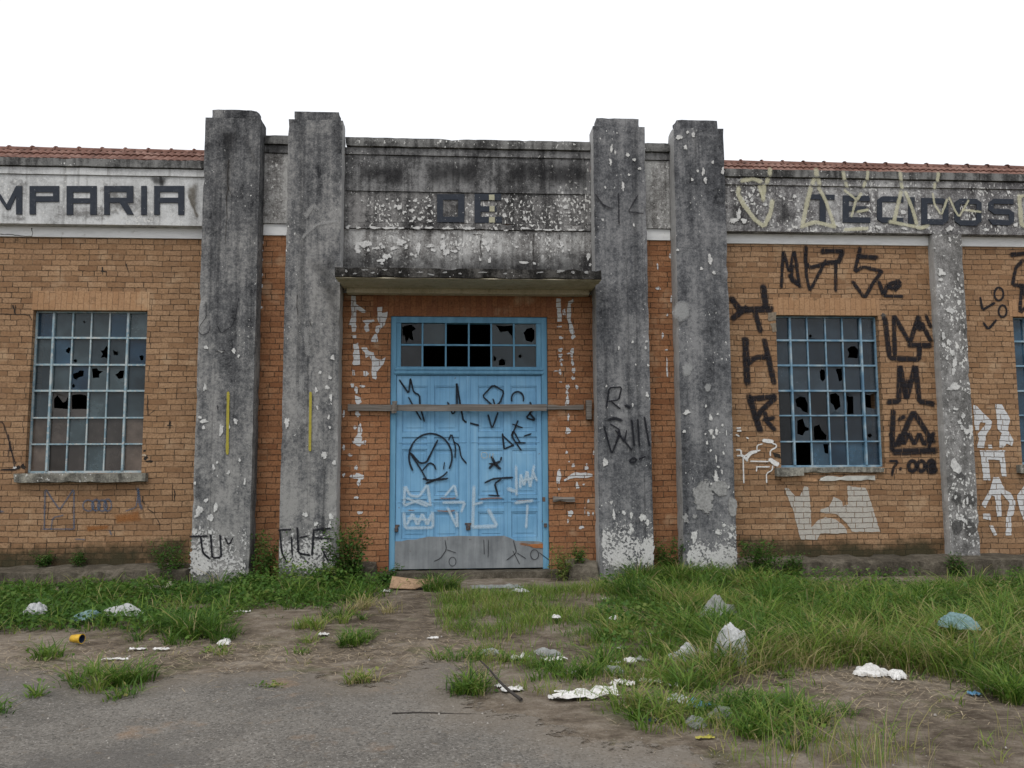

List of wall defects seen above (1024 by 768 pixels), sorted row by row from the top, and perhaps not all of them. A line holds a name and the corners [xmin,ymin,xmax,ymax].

leakage [512,166,581,180]
peeling [345,198,491,274]
peeling [502,198,584,253]
peeling [555,298,578,434]
peeling [942,332,961,390]
peeling [316,296,388,514]
peeling [189,498,247,578]
peeling [279,512,334,573]
peeling [556,451,609,489]
peeling [601,501,655,570]
peeling [683,405,738,570]
spalling [952,491,979,547]